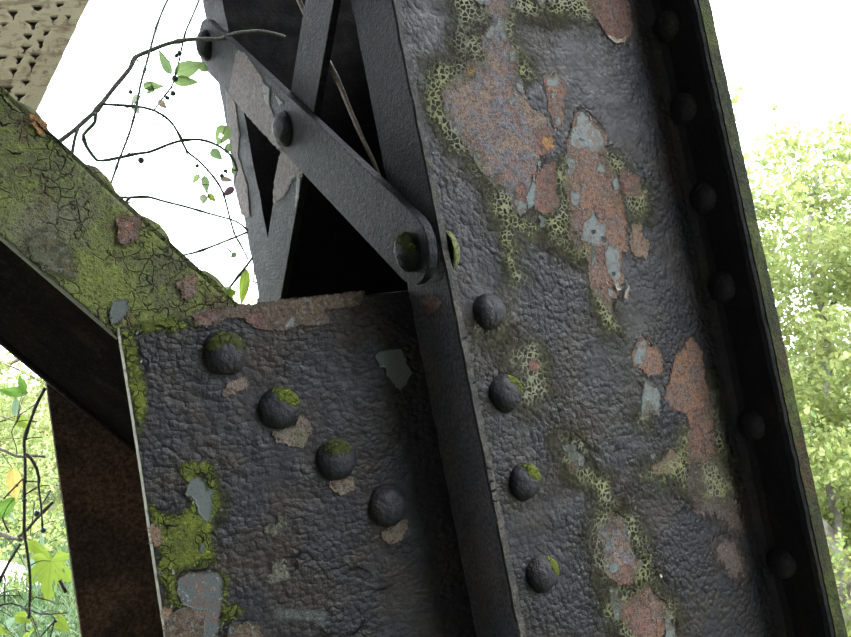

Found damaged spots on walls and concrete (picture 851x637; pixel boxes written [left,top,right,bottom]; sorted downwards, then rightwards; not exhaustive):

corrosion [582,0,633,44]
crack [0,94,65,147]
peeling [225,49,303,218]
corrosion [618,166,652,260]
peeling [375,349,412,390]
corrosion [664,337,746,580]
peeling [185,476,214,523]
peeling [147,523,163,547]
peeling [160,572,224,637]